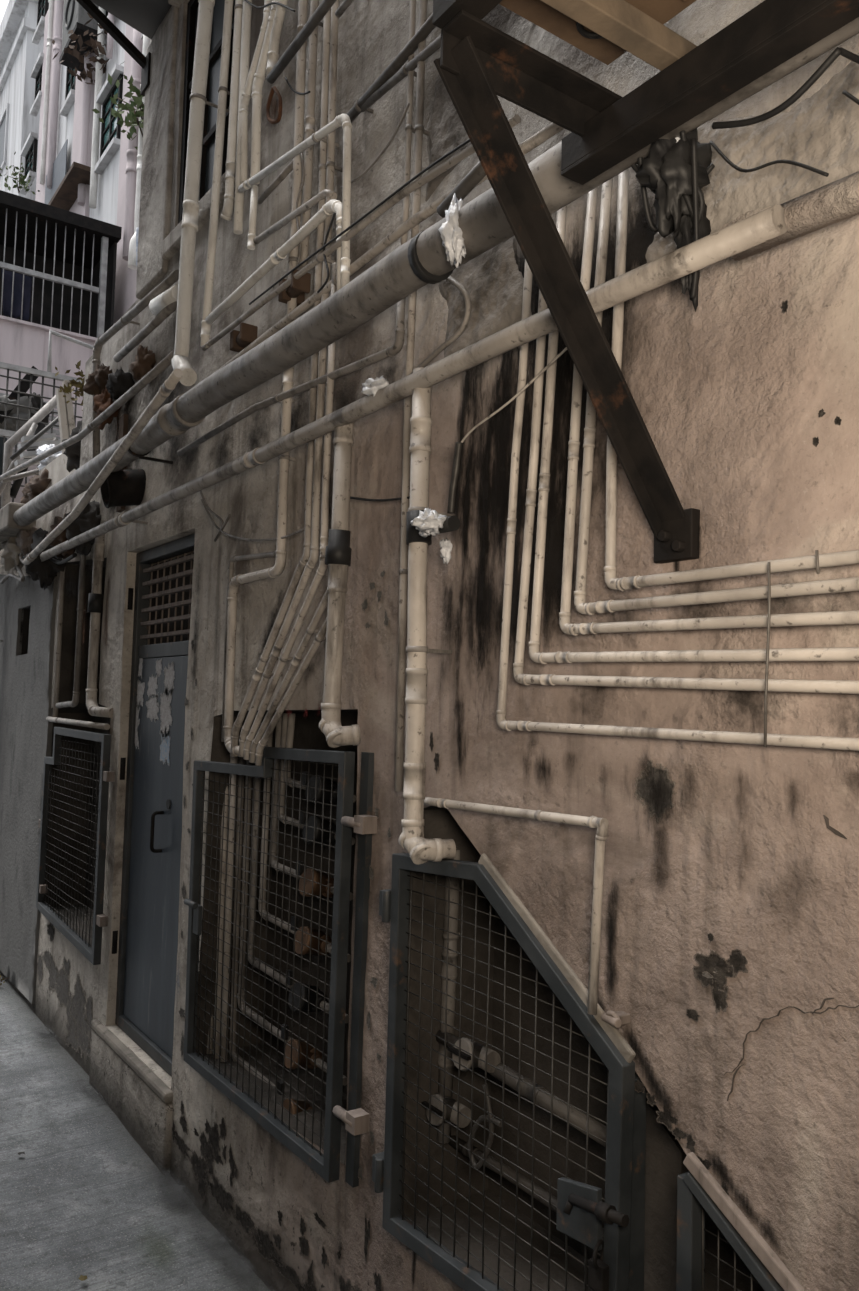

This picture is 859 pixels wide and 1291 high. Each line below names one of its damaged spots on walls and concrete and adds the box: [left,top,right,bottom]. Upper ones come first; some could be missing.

water stain [513,244,548,315]
water stain [571,185,657,289]
water stain [602,300,630,356]
water stain [442,332,596,679]
water stain [455,699,465,774]
water stain [634,760,691,884]
peeling [37,922,93,1058]
flaking render [686,933,748,1022]
crack [724,998,859,1101]